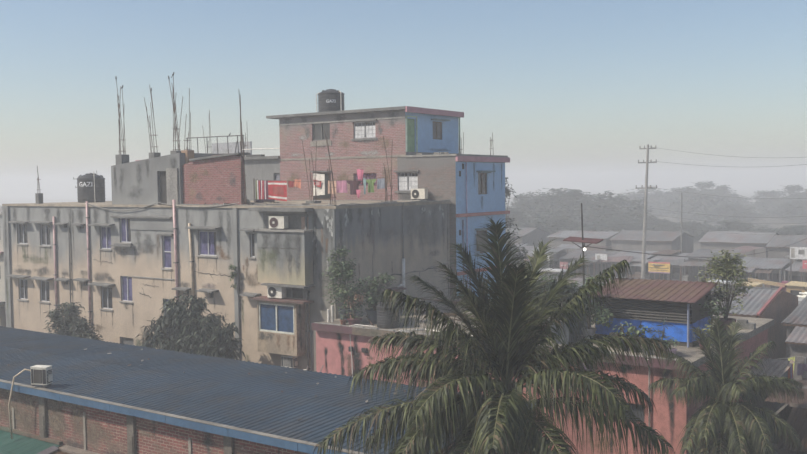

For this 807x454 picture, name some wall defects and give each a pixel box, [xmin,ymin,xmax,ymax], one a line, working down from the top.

leakage [337,333,371,376]